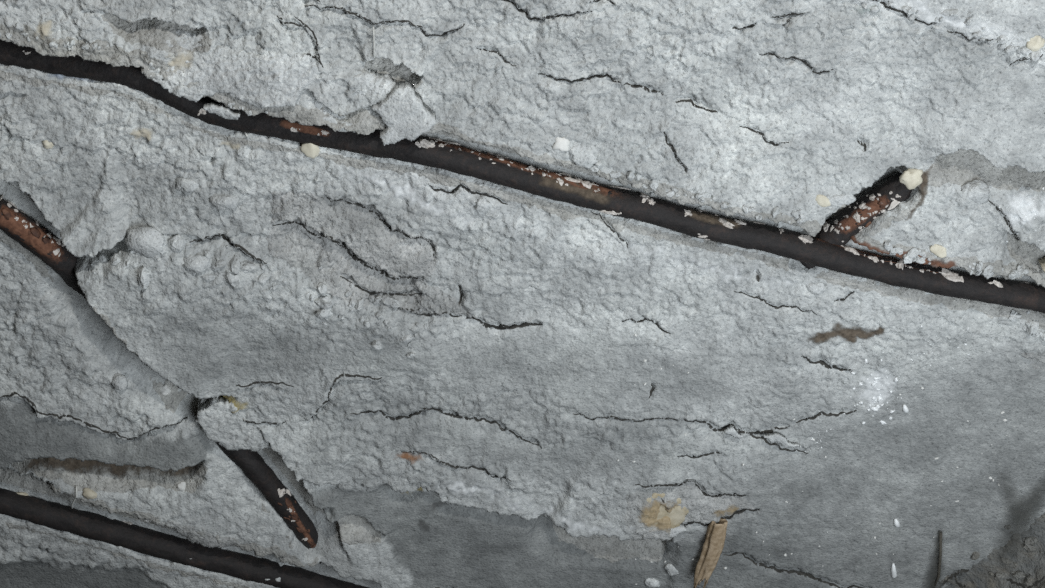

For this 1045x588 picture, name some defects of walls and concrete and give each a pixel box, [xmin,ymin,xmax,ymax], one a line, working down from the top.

peeling [0,13,423,135]
corrosion [0,205,60,260]
spalling [266,190,477,318]
crack [273,197,543,330]
crack [429,184,508,205]
corrosion [434,139,613,204]
corrosion [838,197,955,273]
corrosion [908,171,928,218]
spalling [815,269,1045,330]
peeling [84,237,338,515]
crack [351,407,542,449]
crack [574,383,857,526]